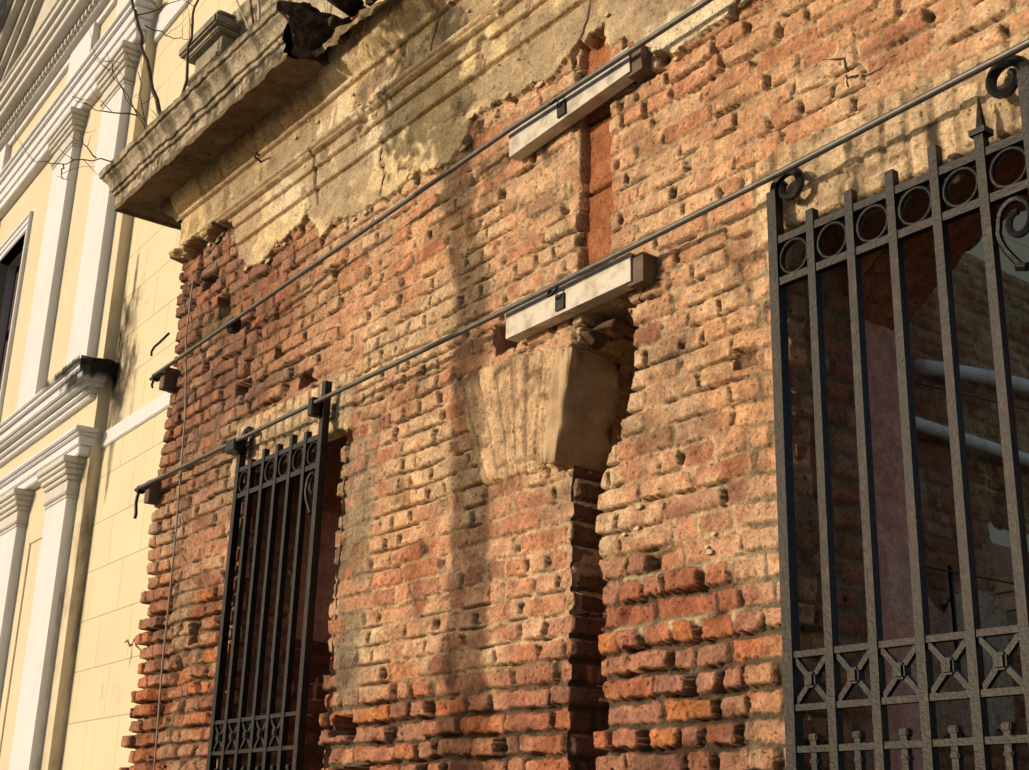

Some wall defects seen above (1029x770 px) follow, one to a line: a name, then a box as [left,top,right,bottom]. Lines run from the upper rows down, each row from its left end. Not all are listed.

peeling [423,0,472,52]
peeling [171,52,573,324]
damp [46,259,138,429]
spalling [271,341,286,363]
spalling [492,321,522,357]
spalling [733,342,760,371]
spalling [235,376,253,398]
spalling [298,368,318,390]